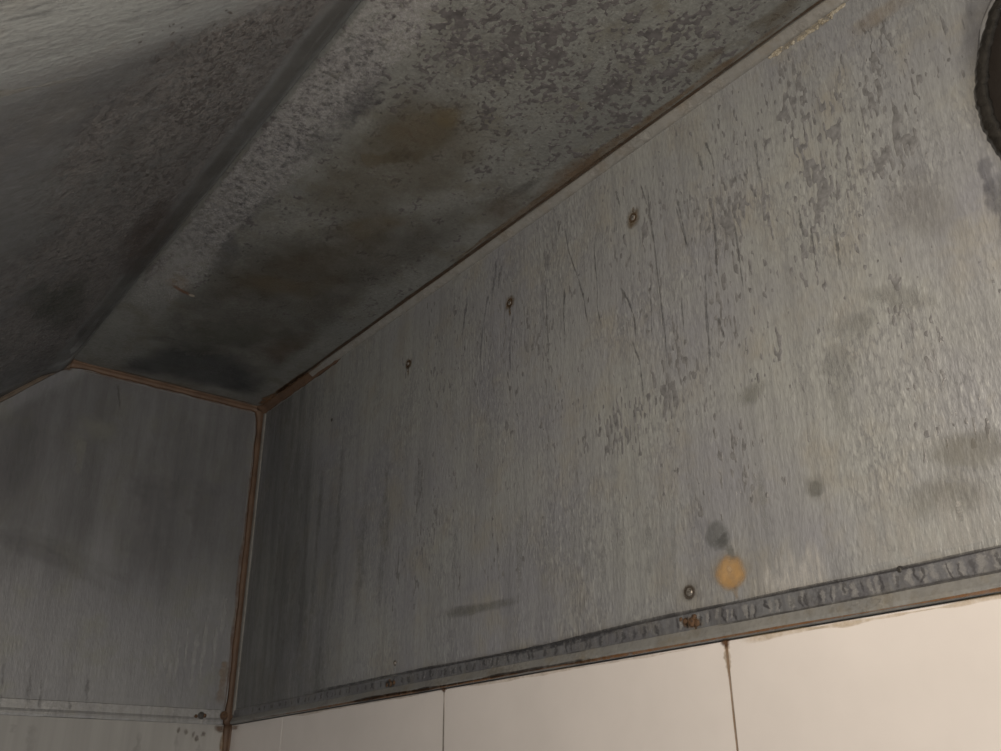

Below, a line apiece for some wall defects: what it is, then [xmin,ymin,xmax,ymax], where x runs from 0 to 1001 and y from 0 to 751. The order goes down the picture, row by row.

damp [122,0,435,294]
rust [718,559,744,588]